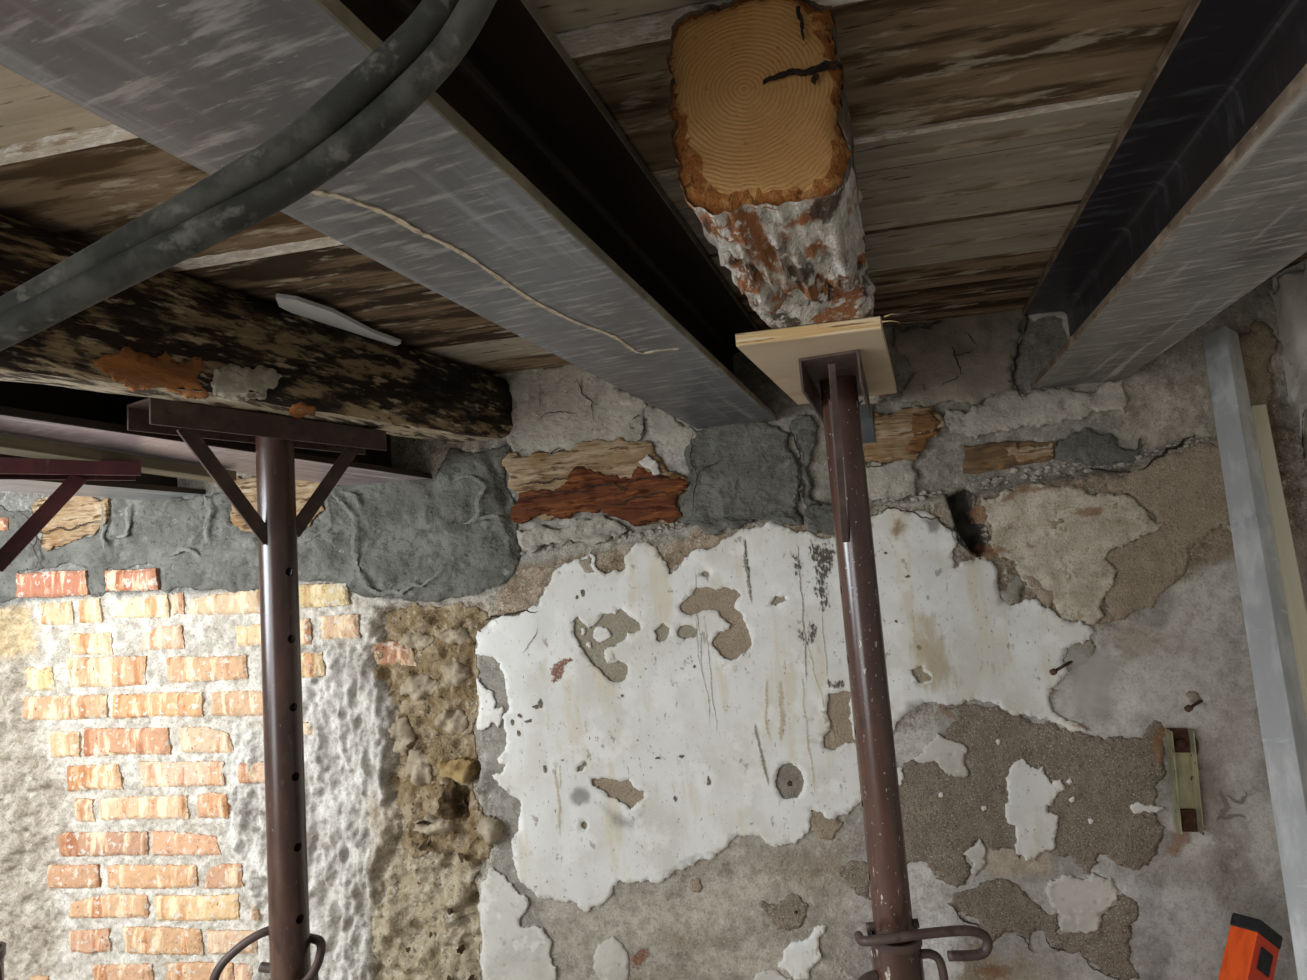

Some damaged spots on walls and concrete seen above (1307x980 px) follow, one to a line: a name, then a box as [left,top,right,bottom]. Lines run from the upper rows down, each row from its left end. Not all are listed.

flaking render [1238,266,1307,445]
flaking render [0,517,9,531]
flaking render [10,564,265,980]
flaking render [303,722,313,736]
flaking render [299,583,417,678]
flaking render [475,521,861,980]
spalling [871,442,1230,980]
spalling [839,860,871,900]